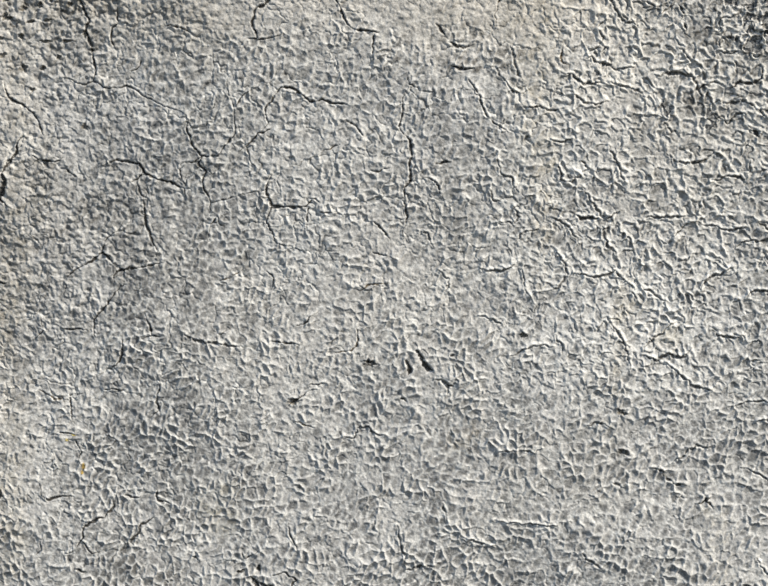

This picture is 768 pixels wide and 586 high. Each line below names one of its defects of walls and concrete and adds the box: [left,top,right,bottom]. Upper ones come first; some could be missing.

crack [69,0,159,104]
crack [250,0,281,40]
crack [335,0,379,62]
crack [0,84,76,207]
crack [374,75,449,240]
crack [64,86,364,336]
crack [64,488,170,573]